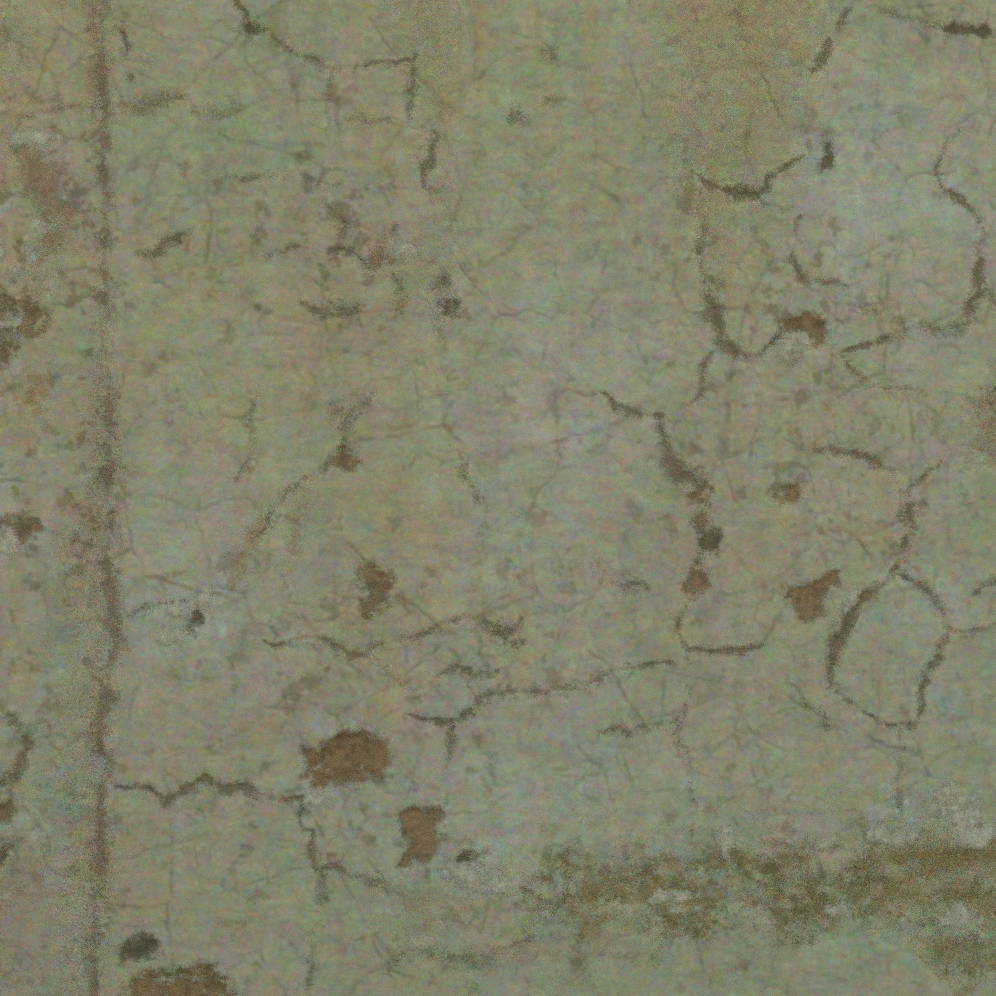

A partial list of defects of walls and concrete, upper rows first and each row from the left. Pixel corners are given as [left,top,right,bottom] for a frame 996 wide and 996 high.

crack [231,0,444,190]
spalling [772,309,831,366]
crack [689,131,996,404]
crack [20,1,408,996]
crack [593,392,713,571]
spalling [117,931,249,996]
spalling [295,720,393,810]
spalling [394,801,527,901]
crack [403,603,766,832]
damp [559,820,996,982]
spalling [778,567,859,636]
crack [791,444,996,815]